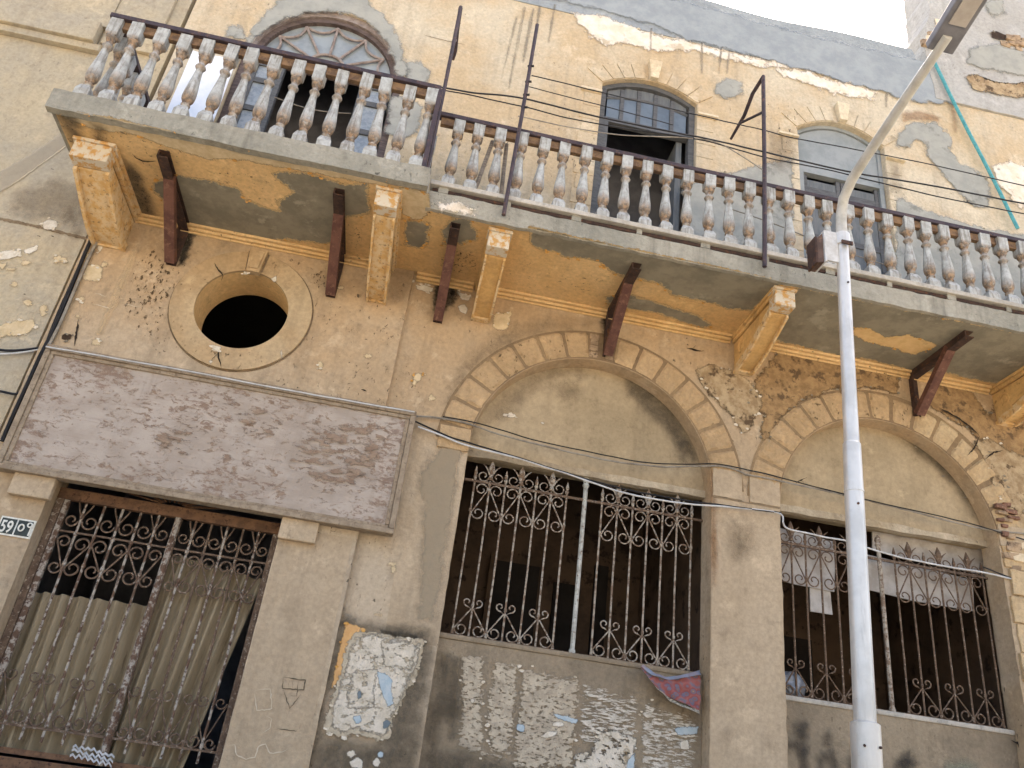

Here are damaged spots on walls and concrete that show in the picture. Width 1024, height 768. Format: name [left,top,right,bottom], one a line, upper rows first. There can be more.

flaking render [572,12,876,101]
spalling [965,74,1024,98]
spalling [989,30,1024,51]
peeling [75,111,481,272]
rust [433,188,837,276]
flaking render [0,217,60,338]
rust [850,275,1024,315]
spalling [696,288,842,442]
peeling [852,299,1024,572]
crack [940,408,1002,458]
peeling [331,622,366,688]
peeling [675,726,699,750]